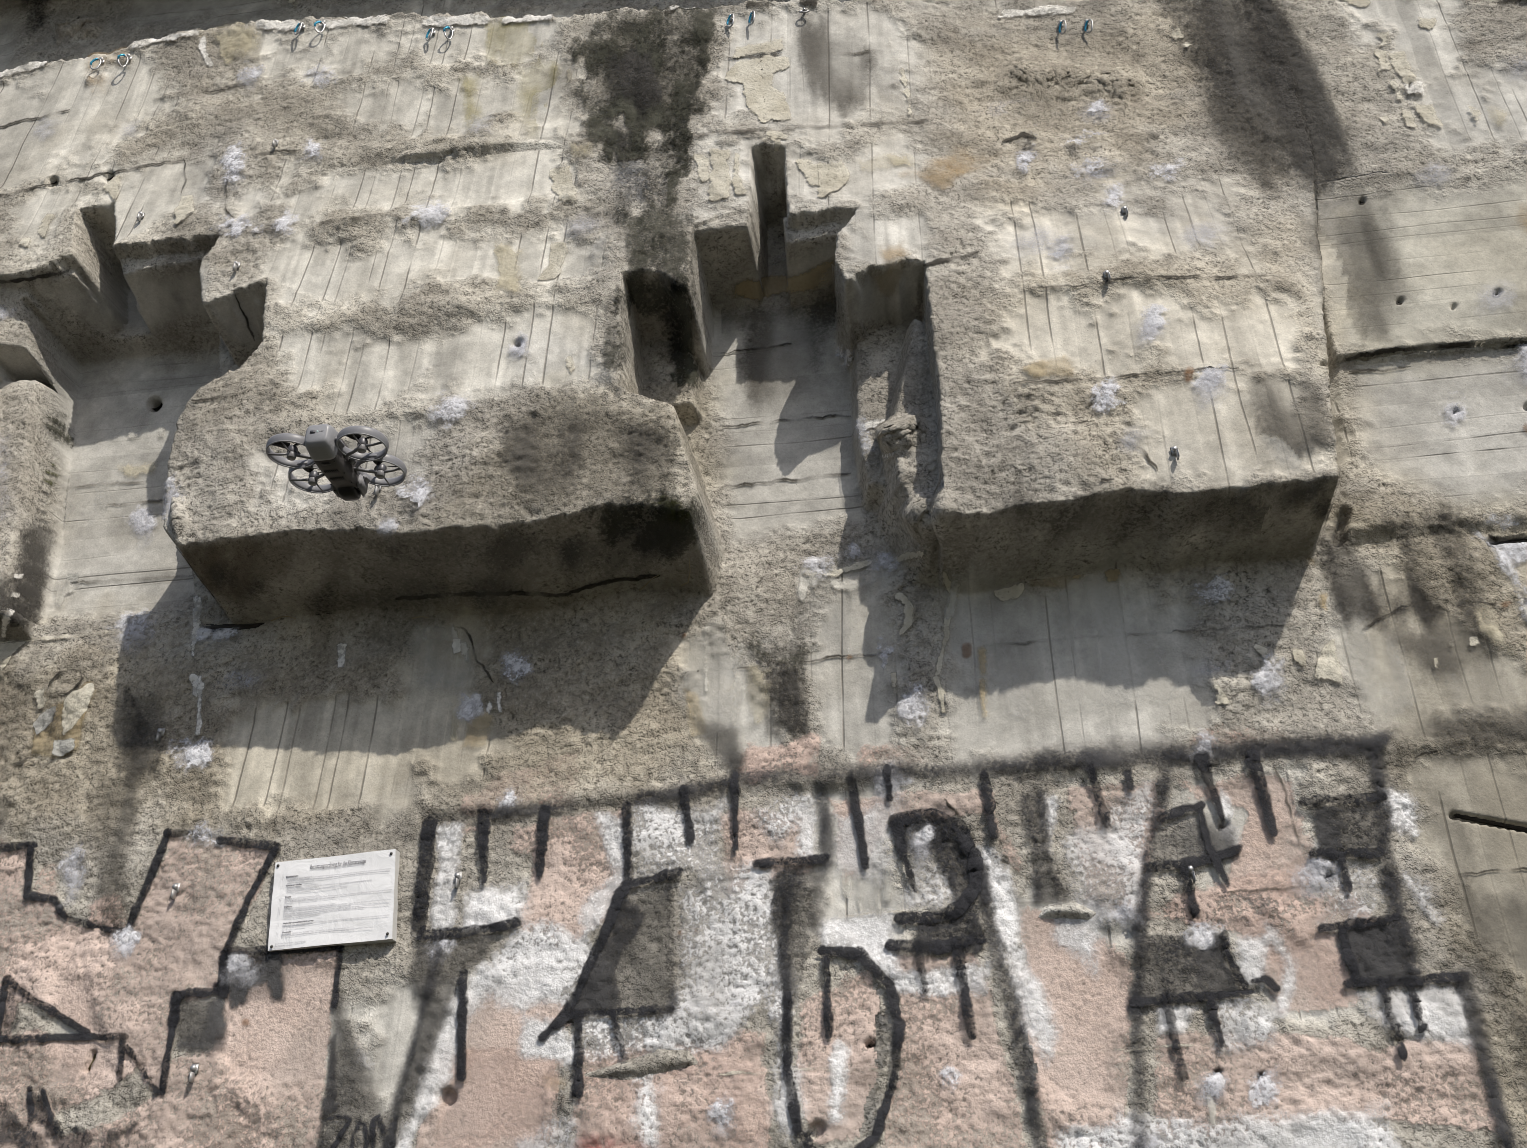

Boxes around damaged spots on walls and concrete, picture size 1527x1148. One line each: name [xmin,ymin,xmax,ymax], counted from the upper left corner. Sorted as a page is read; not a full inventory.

damp [1158,0,1342,192]
damp [567,5,720,292]
peeling [173,195,194,224]
peeling [796,158,850,197]
damp [1106,185,1123,206]
peeling [798,551,924,600]
crack [395,574,660,682]
peeling [893,592,915,635]
damp [751,636,810,736]